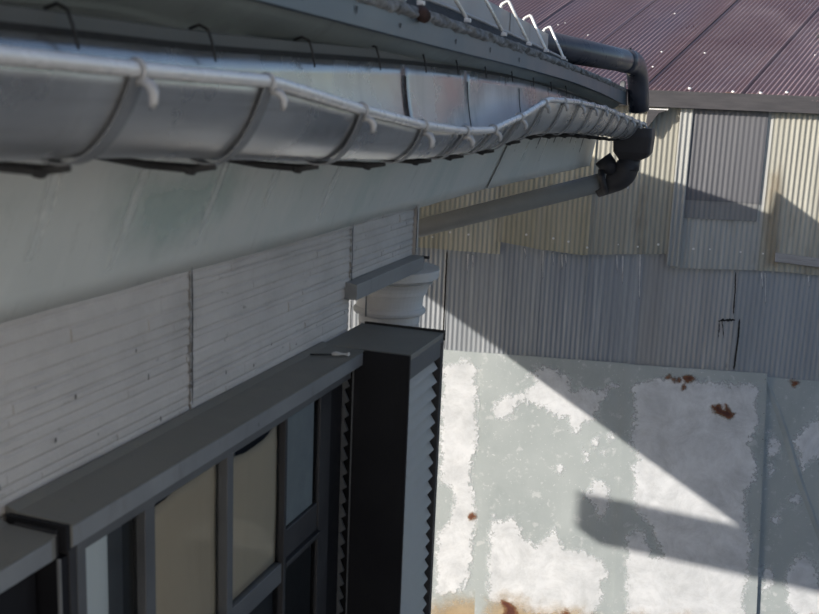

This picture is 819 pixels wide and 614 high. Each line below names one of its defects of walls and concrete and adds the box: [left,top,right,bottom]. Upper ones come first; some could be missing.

leakage [491,365,620,435]
rust [665,375,695,390]
rust [711,404,735,420]
leakage [792,420,819,472]
leakage [435,359,480,596]
leakage [581,480,610,521]
leakage [624,377,781,614]
rust [431,601,475,614]
rust [488,600,533,614]
leakage [485,514,609,614]
leakage [783,554,819,614]